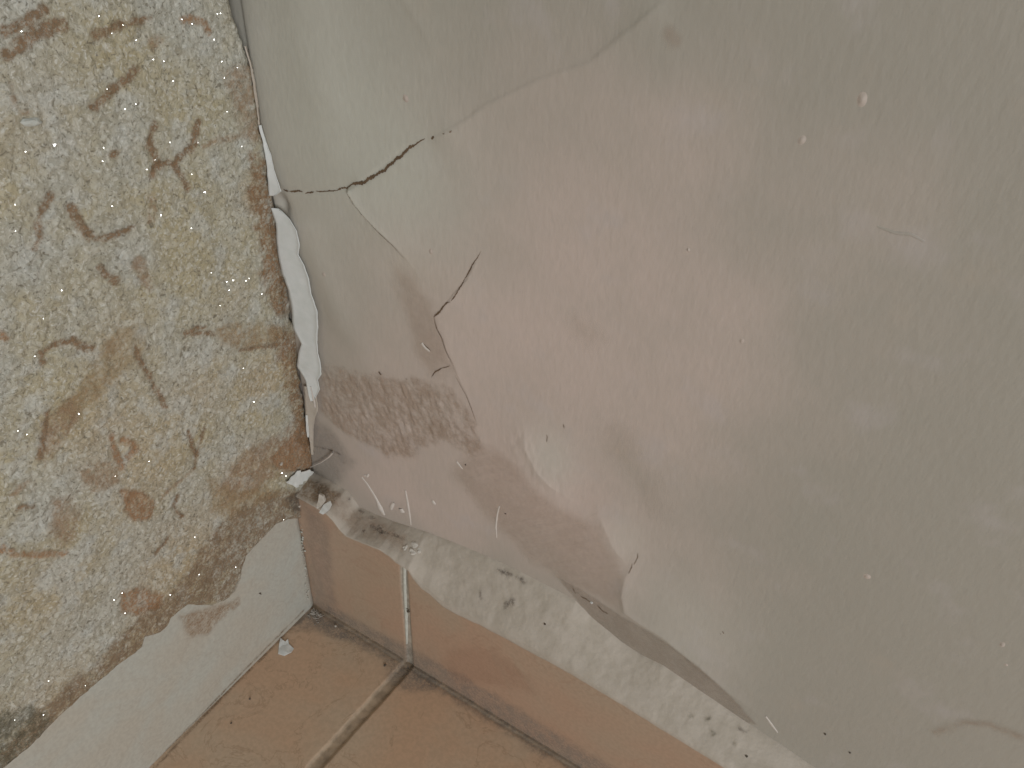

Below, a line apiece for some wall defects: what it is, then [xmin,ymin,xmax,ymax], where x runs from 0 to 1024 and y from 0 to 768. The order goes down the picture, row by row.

crack [283,130,452,194]
peeling [244,46,322,455]
crack [424,253,480,421]